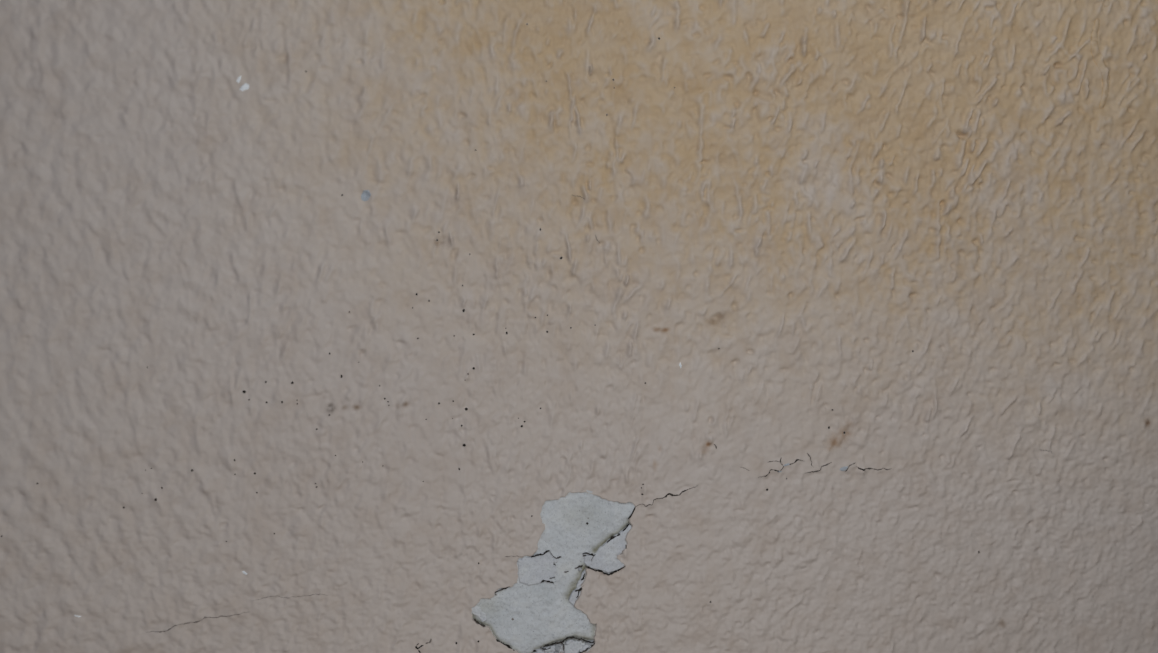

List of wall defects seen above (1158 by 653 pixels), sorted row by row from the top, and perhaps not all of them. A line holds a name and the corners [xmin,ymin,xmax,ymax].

crack [741,453,892,478]
crack [636,485,698,507]
peeling [471,490,635,653]